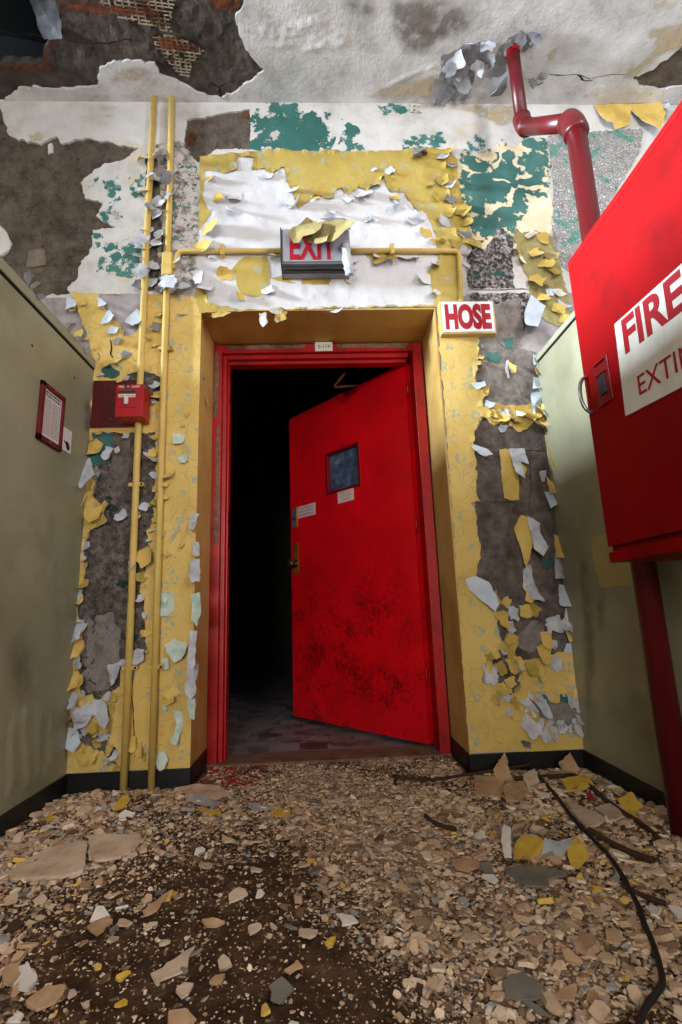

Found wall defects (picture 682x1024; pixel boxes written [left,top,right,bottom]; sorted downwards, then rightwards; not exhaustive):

peeling [378,30,543,115]
crack [526,72,632,89]
spalling [633,46,682,88]
spalling [0,0,372,405]
peeling [341,166,395,203]
peeling [588,102,673,215]
peeling [368,253,441,295]
peeling [498,341,516,379]
peeling [471,355,557,508]
peeling [65,411,201,772]
peeling [466,534,585,744]